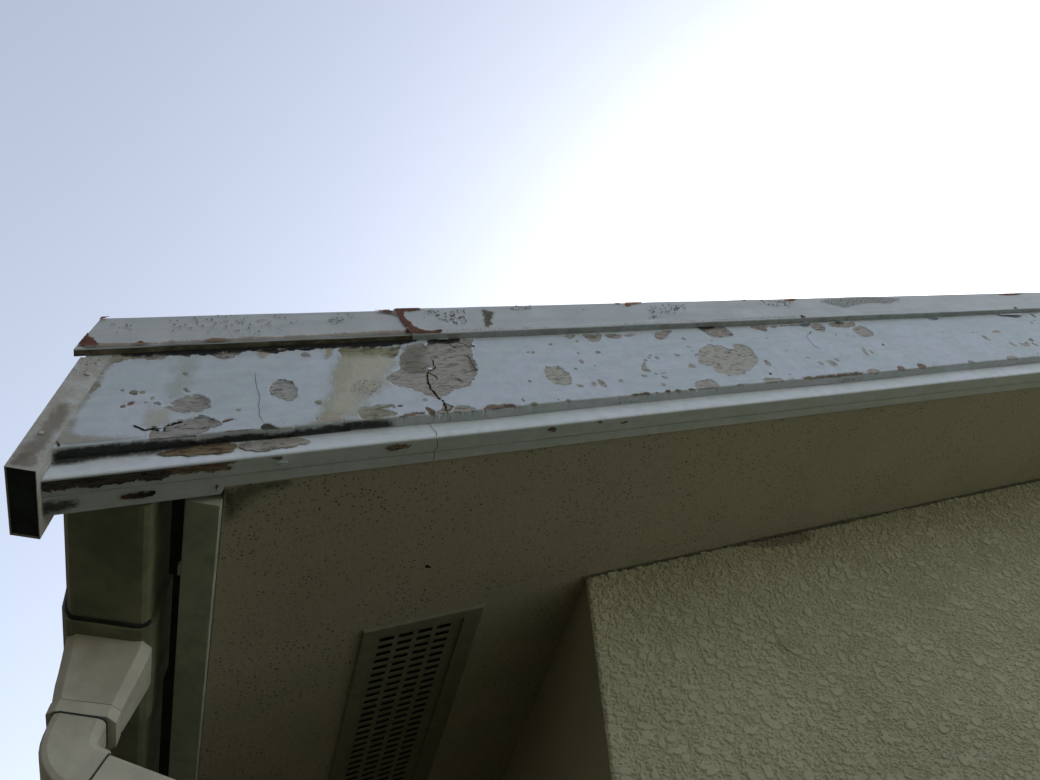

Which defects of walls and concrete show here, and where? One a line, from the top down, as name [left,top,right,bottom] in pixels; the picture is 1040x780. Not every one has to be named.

corrosion [78,333,99,345]
peeling [42,372,311,493]
peeling [88,338,537,420]
corrosion [375,308,442,333]
crack [405,342,477,460]
peeling [528,334,636,388]
peeling [630,327,880,396]
peeling [750,321,884,356]